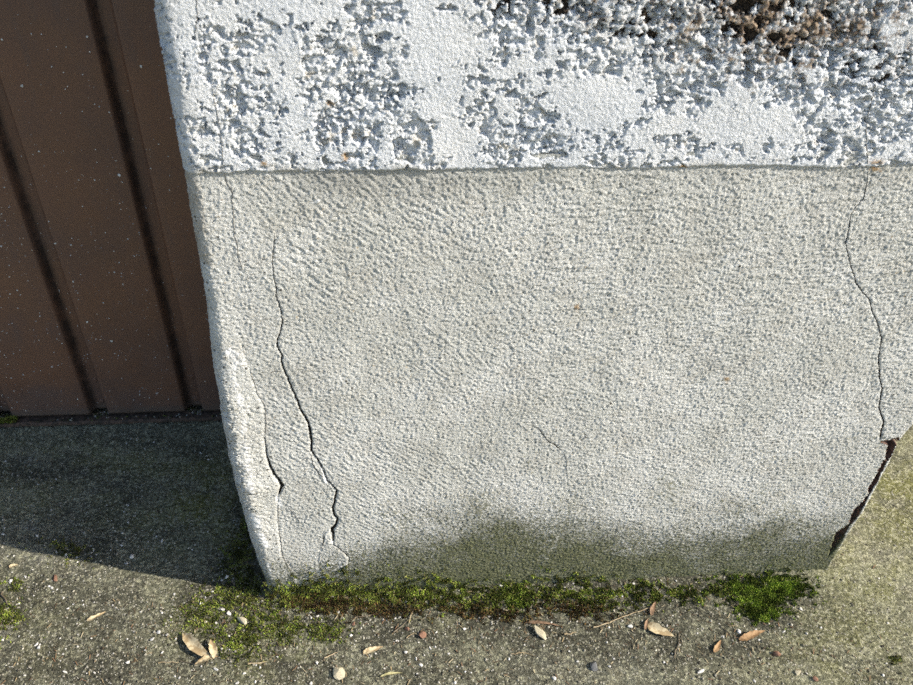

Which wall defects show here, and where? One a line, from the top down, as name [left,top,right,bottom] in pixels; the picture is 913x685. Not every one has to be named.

damp [542,0,575,23]
damp [595,7,657,40]
damp [671,0,842,67]
damp [824,30,896,85]
crack [845,86,884,438]
damp [225,347,257,500]
crack [250,236,350,570]
damp [248,512,271,549]
damp [261,559,368,597]